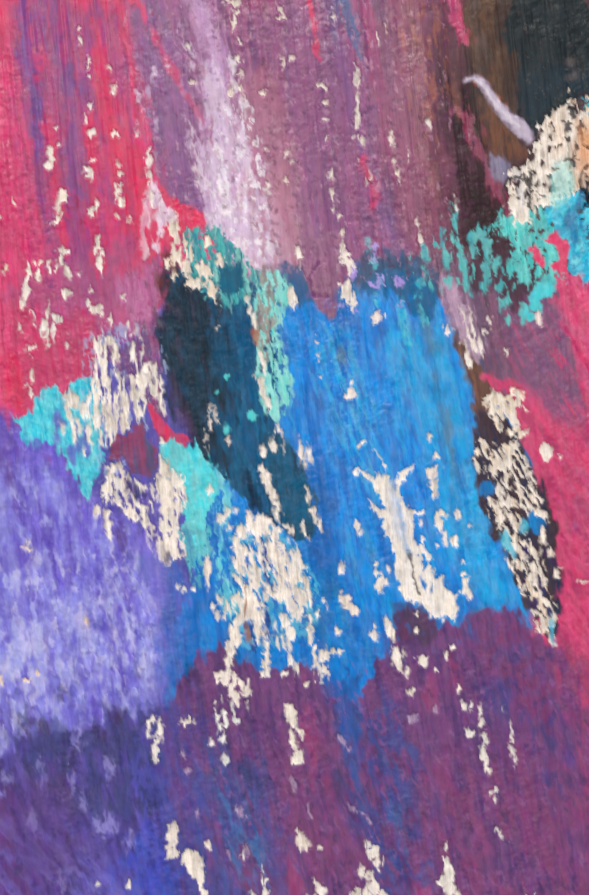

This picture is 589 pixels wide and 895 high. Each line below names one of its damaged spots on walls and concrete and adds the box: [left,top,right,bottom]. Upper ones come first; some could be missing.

peeling [506,88,589,228]
crack [552,145,589,209]
peeling [165,211,225,303]
peeling [60,289,168,457]
peeling [93,437,188,567]
peeling [204,423,345,767]
peeling [353,451,474,634]
peeling [473,388,560,647]
peeling [284,704,305,793]
peeling [165,822,212,895]
peeling [352,839,388,895]
peeling [436,842,461,895]